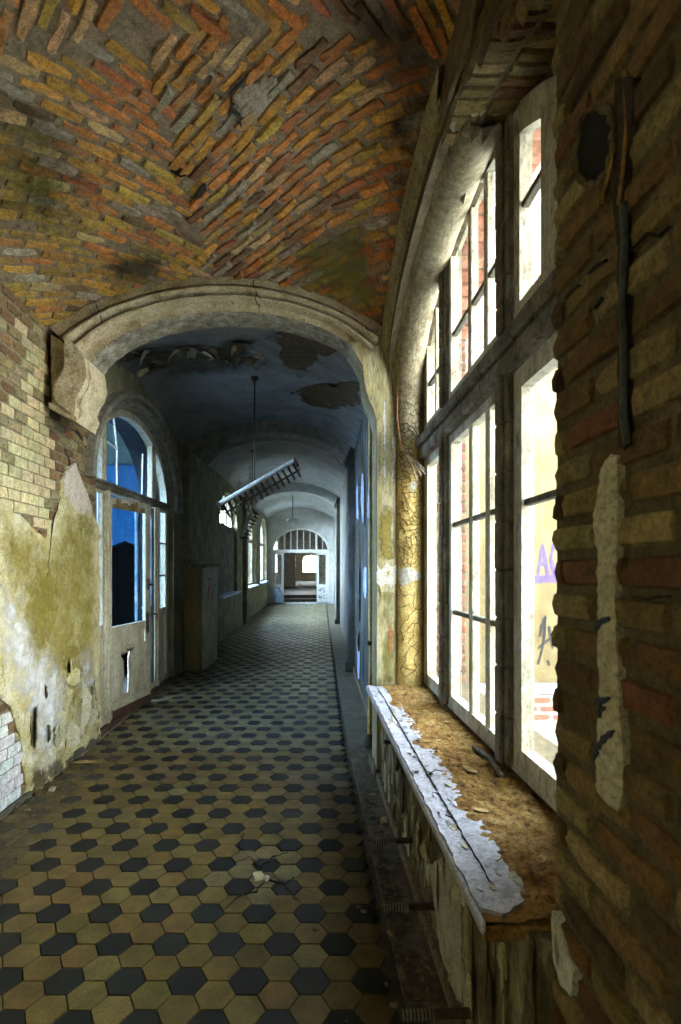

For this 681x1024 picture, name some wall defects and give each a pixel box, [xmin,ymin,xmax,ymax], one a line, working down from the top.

flaking render [234,75,277,119]
spalling [570,103,617,190]
flaking render [115,331,365,414]
flaking render [62,463,92,515]
crack [398,394,423,677]
leakage [5,517,94,748]
peeling [30,657,101,765]
crack [378,689,490,882]
crack [225,832,298,909]
peeling [375,689,508,1024]